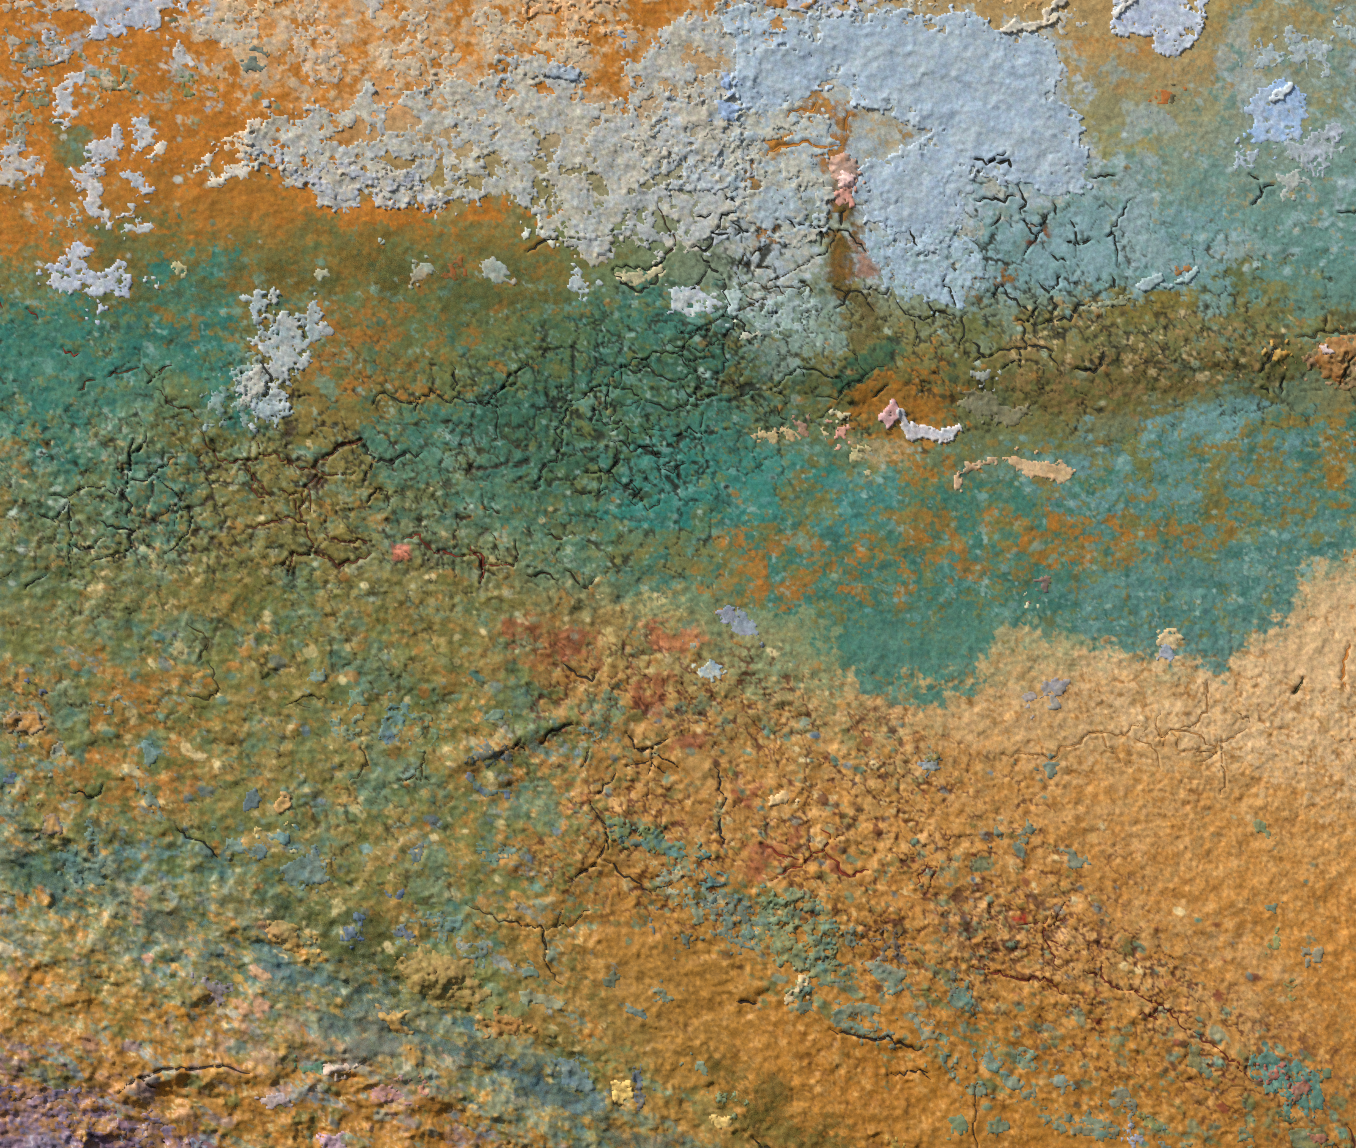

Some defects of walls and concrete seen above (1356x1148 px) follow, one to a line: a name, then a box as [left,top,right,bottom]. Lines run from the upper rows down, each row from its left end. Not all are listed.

peeling [1110,0,1210,58]
peeling [0,0,1093,354]
crack [0,434,193,589]
crack [62,347,422,575]
peeling [200,269,334,435]
crack [403,508,595,589]
peeling [878,369,1032,444]
peeling [954,447,1076,492]
peeling [1082,264,1200,316]
crack [468,724,679,984]
crack [762,829,869,881]
crack [971,902,1254,1082]